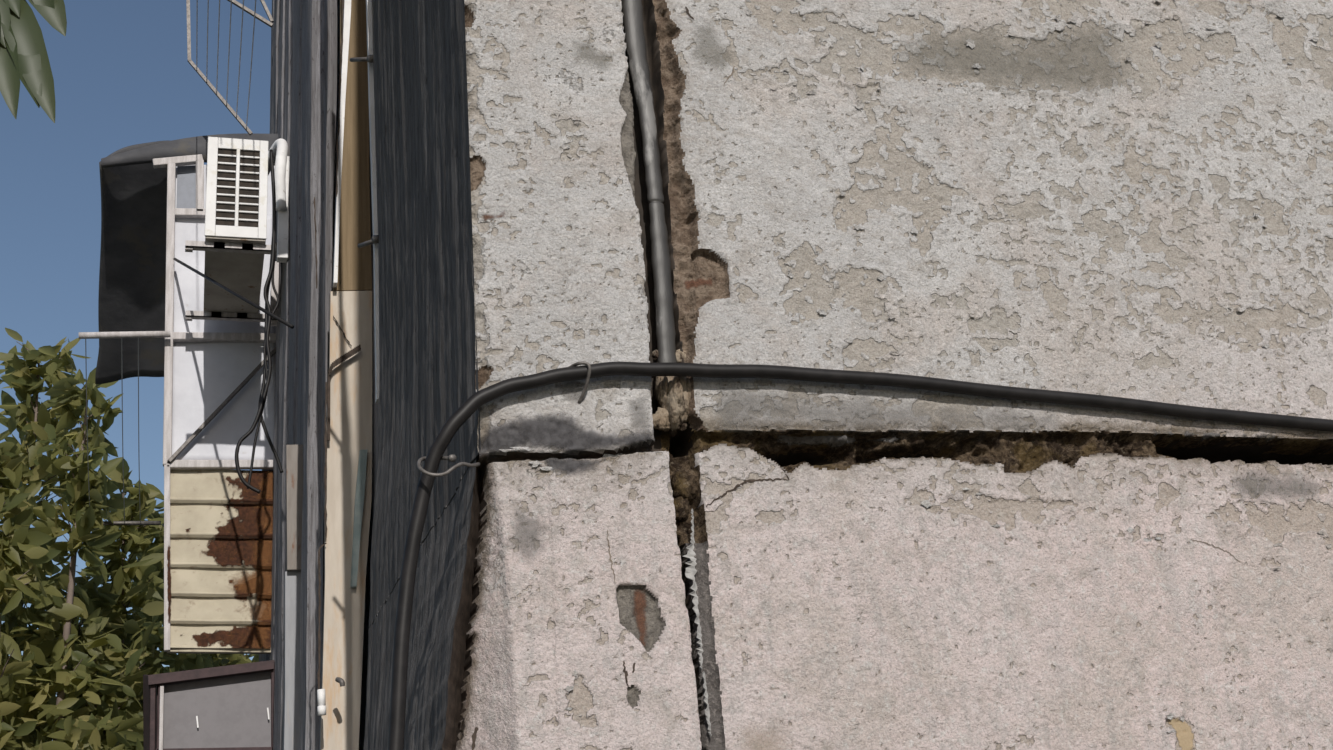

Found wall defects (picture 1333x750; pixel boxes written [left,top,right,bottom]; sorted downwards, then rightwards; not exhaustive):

spalling [619,0,731,458]
water stain [479,416,654,473]
spalling [766,452,833,467]
spalling [856,454,928,464]
spalling [1155,440,1333,465]
corrosion [180,470,274,649]
spalling [616,585,666,652]
peeling [1165,713,1196,750]